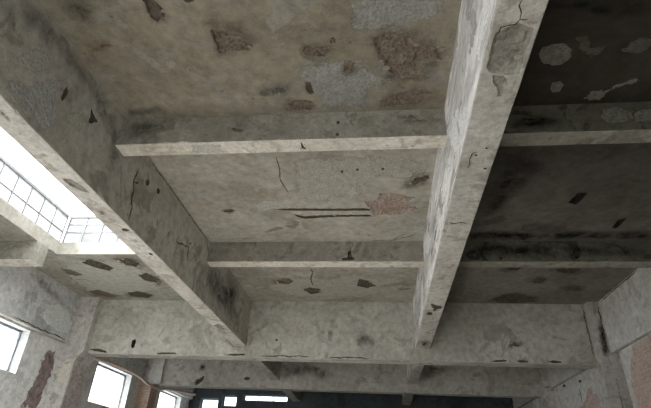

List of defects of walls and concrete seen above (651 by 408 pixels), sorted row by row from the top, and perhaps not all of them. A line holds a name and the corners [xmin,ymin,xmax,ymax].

spalling [142,0,166,22]
crack [497,0,527,35]
spalling [211,28,253,54]
flaking render [287,0,445,112]
spalling [466,0,534,97]
flaking render [539,36,607,66]
flaking render [583,78,641,101]
crack [128,160,206,258]
spalling [254,192,418,233]
flaking render [21,350,86,408]